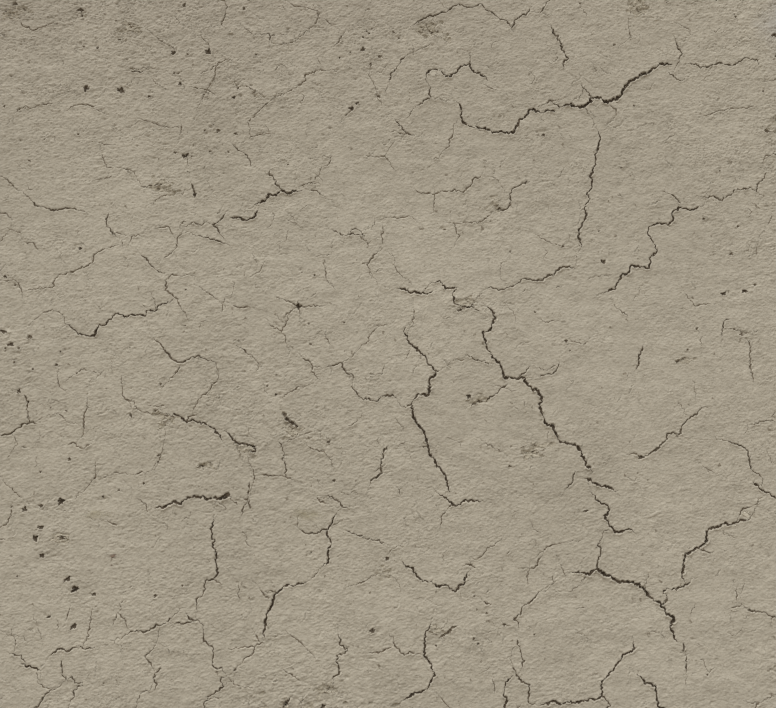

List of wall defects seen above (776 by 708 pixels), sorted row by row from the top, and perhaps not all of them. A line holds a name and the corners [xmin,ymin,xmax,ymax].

crack [16,88,102,112]
crack [193,59,228,105]
crack [368,0,569,104]
crack [0,134,332,337]